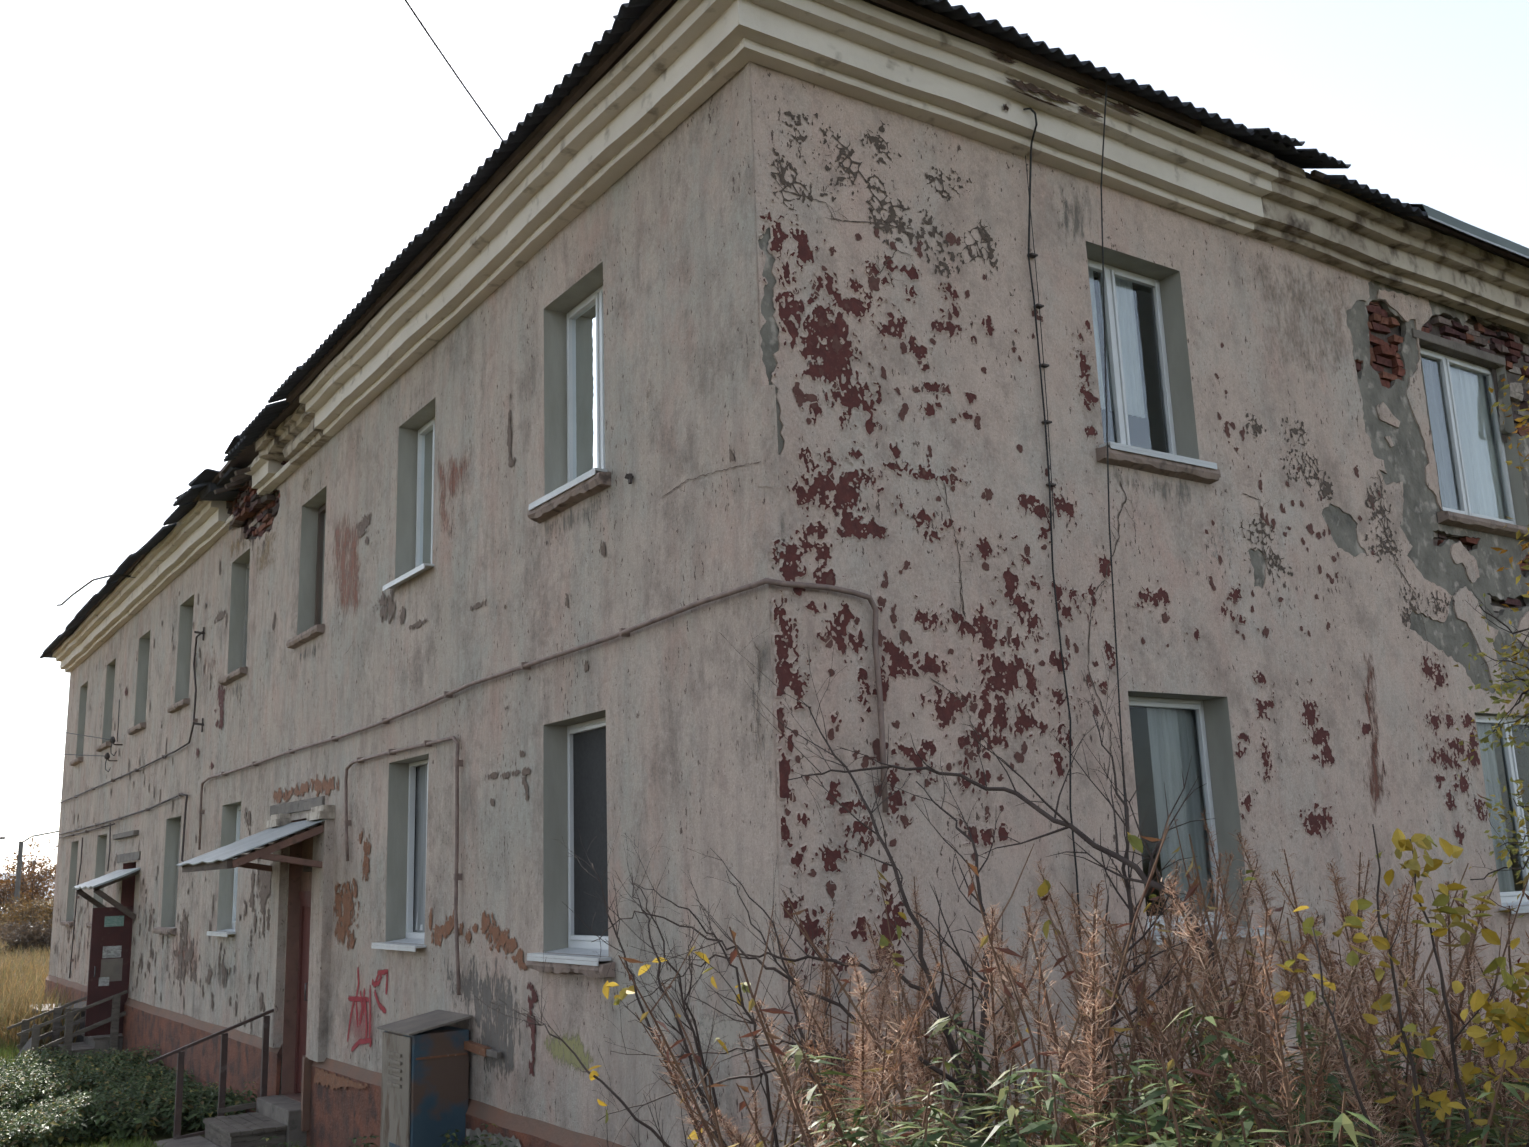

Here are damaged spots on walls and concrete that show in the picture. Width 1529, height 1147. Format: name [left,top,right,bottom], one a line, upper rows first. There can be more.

flaking render [225,480,281,551]
peeling [757,197,1116,1121]
peeling [1132,576,1171,623]
peeling [1184,626,1201,643]
flaking render [1209,280,1529,853]
peeling [273,774,339,803]
peeling [333,830,371,949]
peeling [429,908,537,1077]